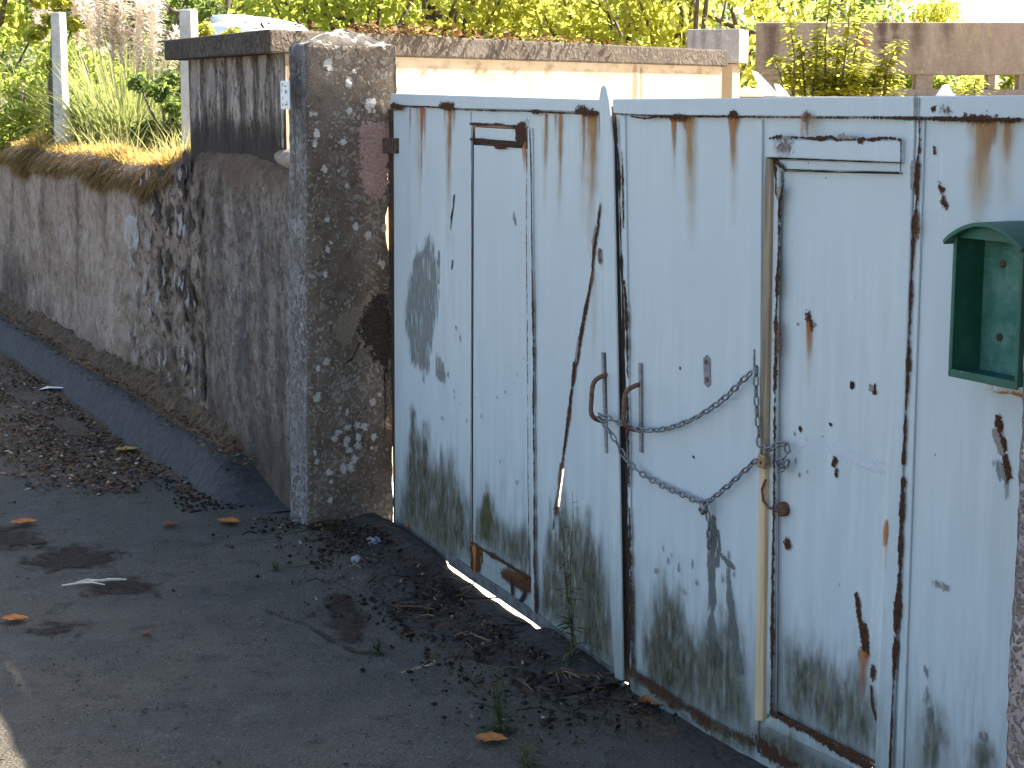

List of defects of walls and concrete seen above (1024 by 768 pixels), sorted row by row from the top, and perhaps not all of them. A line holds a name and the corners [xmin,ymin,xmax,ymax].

rust [390,101,600,164]
rust [614,92,1021,162]
rust [938,181,948,210]
rust [797,309,816,345]
mould [402,412,529,570]
rust [470,542,531,602]
mould [544,518,613,664]
leakage [646,515,745,723]
rust [627,667,874,768]